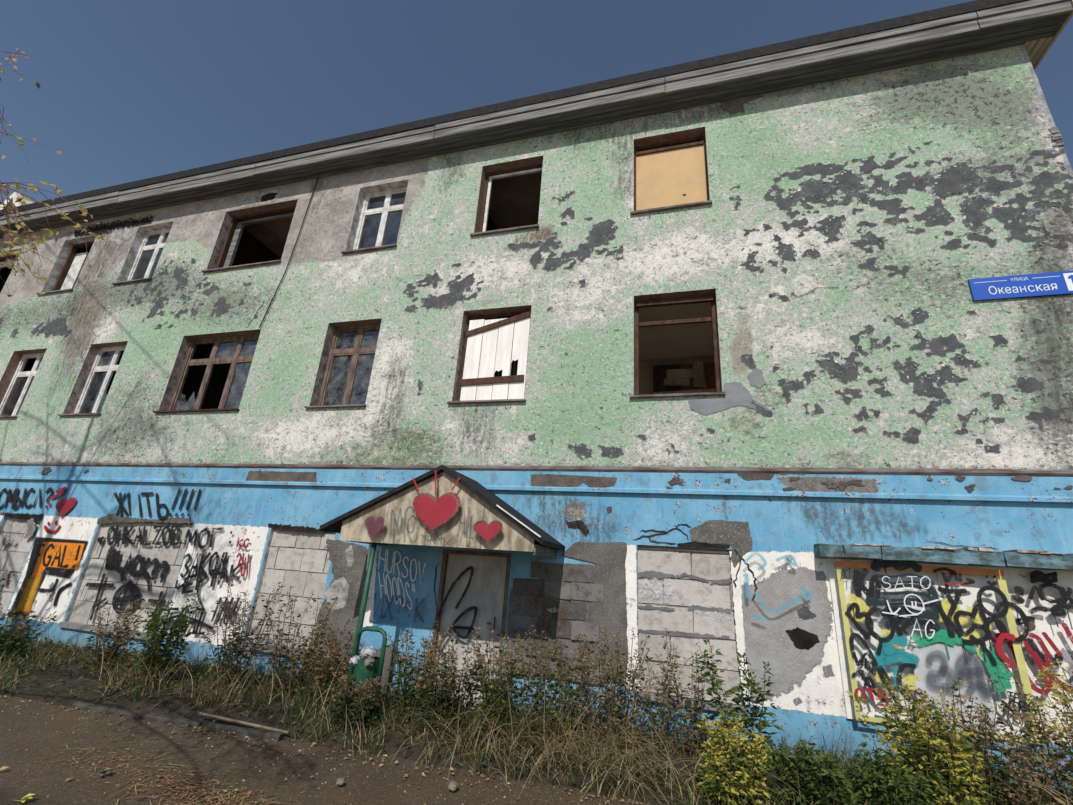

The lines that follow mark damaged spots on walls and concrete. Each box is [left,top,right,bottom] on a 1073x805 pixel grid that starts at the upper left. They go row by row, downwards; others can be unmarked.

peeling [741,127,1073,278]
peeling [507,191,623,272]
peeling [127,258,244,329]
peeling [403,262,484,312]
peeling [769,292,798,303]
peeling [0,317,73,340]
peeling [688,307,1052,453]
peeling [1026,406,1062,431]
peeling [568,442,624,459]
crack [633,524,690,544]
spalling [677,520,753,568]
spalling [741,566,835,706]